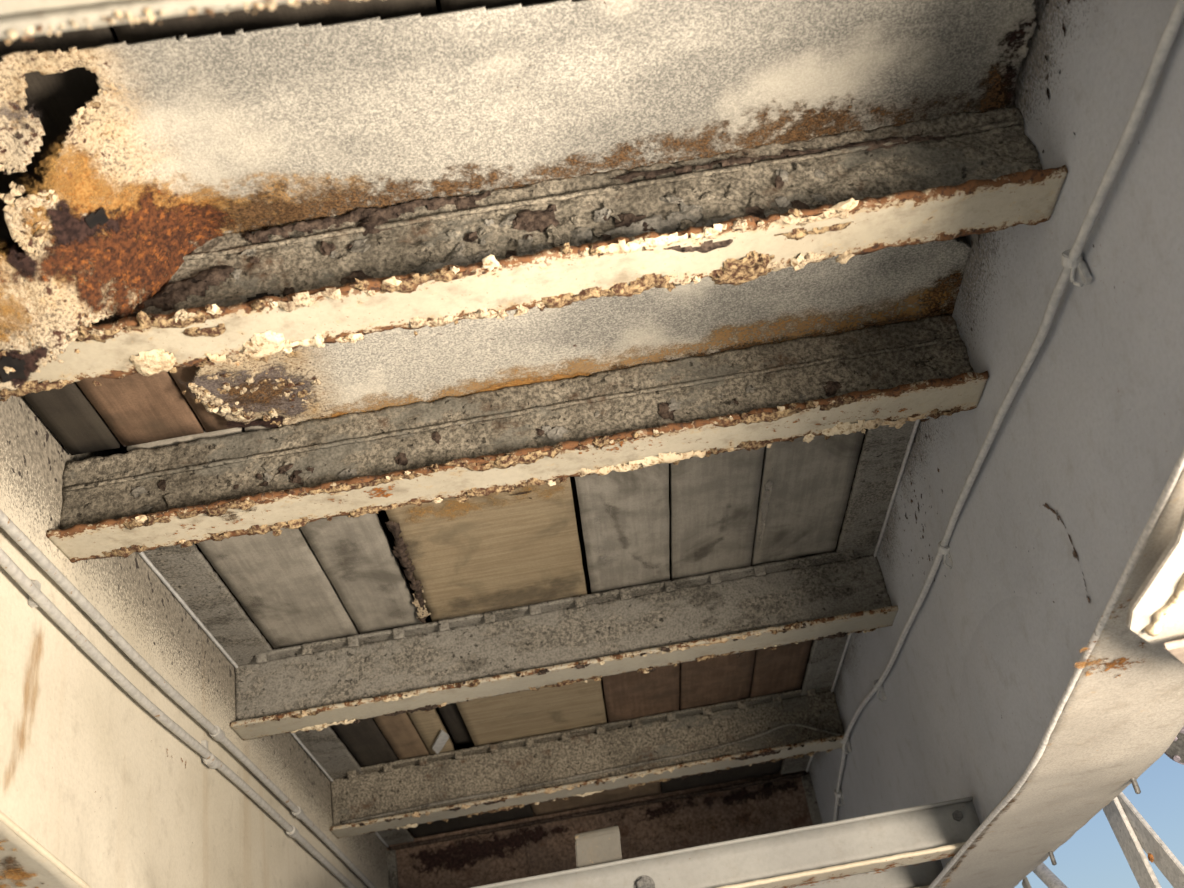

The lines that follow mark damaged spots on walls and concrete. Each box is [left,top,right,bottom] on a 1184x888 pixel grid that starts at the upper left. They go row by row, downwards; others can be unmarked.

peeling [0,89,107,257]
corrosion [0,0,1037,373]
peeling [439,163,859,292]
peeling [172,249,295,337]
peeling [340,270,401,296]
spalling [0,290,150,383]
corrosion [0,381,19,391]
peeling [536,425,614,451]
peeling [632,397,681,439]
peeling [257,461,314,495]
peeling [372,453,418,482]
corrosion [1075,641,1146,678]